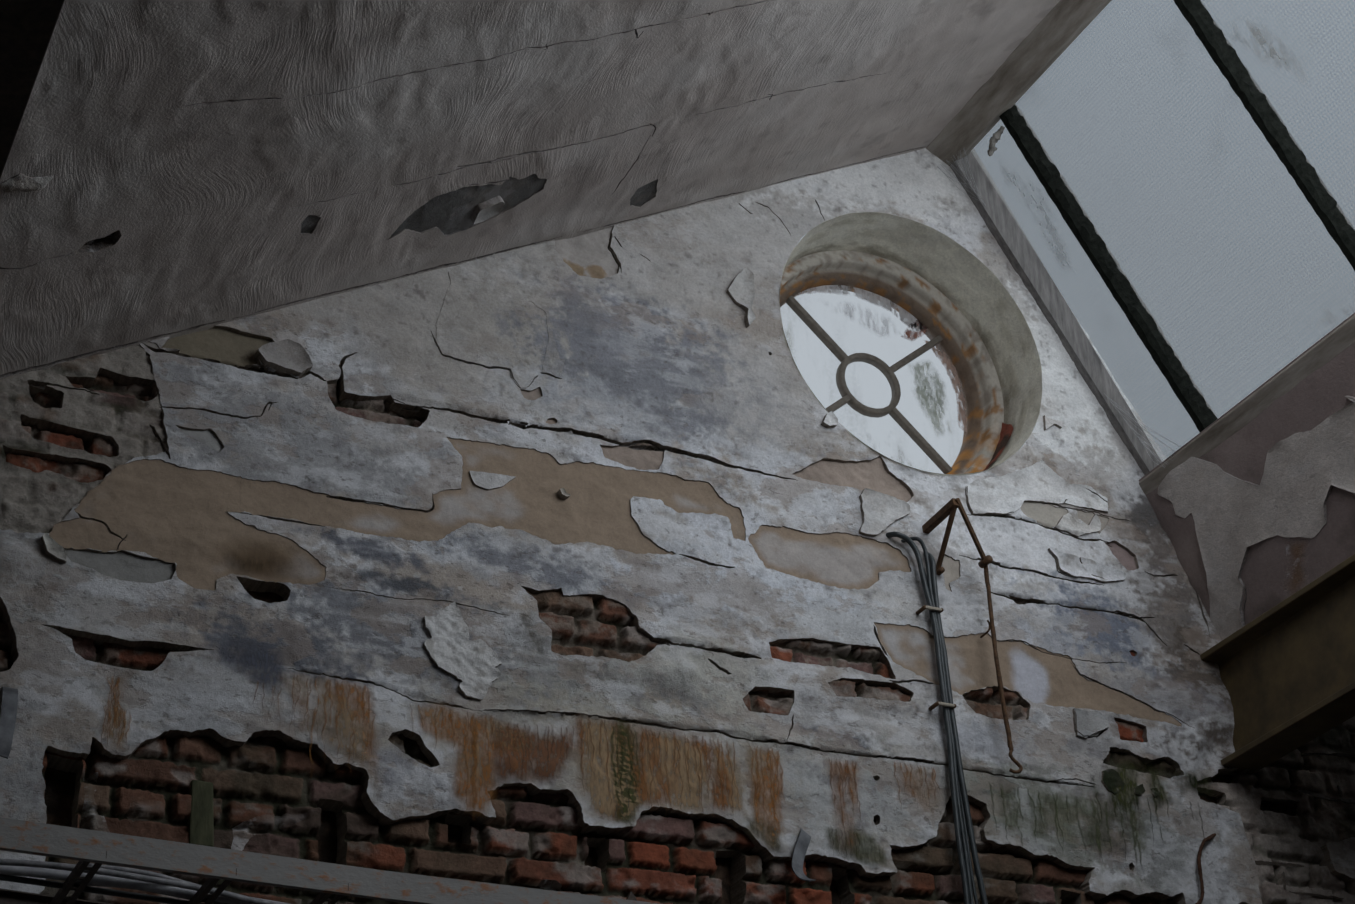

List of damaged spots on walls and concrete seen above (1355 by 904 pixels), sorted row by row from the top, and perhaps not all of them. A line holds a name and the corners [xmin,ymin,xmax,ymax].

crack [184,0,773,106]
crack [0,73,926,459]
peeling [0,325,914,603]
crack [384,399,798,481]
flaking render [966,423,1139,583]
peeling [1157,396,1355,641]
flaking render [41,624,213,671]
flaking render [521,586,670,662]
corrosion [418,706,783,843]
flaking render [40,728,1186,904]
flaking render [743,686,795,715]
peeling [769,622,1184,779]